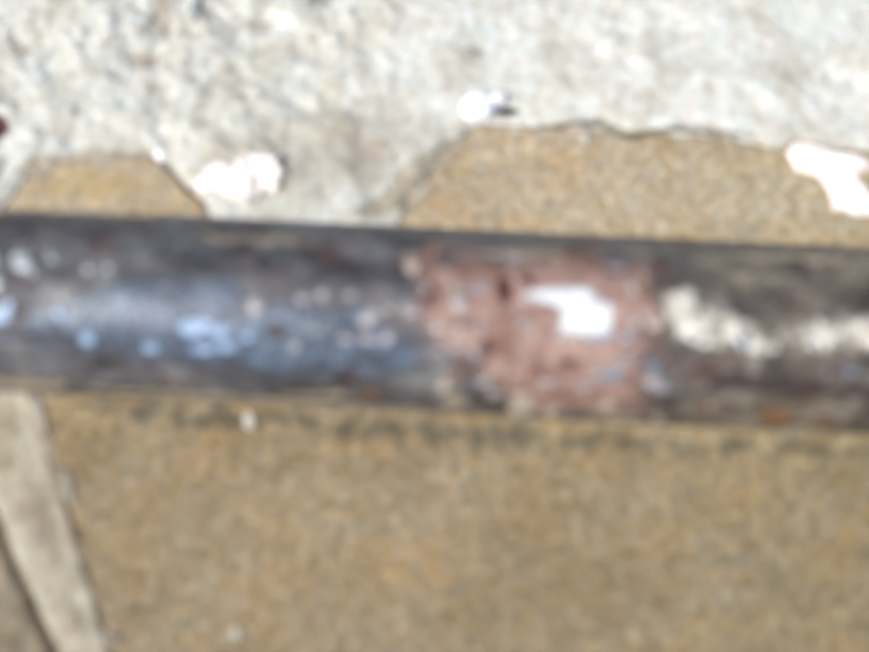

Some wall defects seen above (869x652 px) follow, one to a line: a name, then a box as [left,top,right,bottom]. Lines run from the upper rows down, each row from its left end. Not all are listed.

peeling [154,148,167,162]
rust [406,243,660,416]
peeling [243,411,257,430]